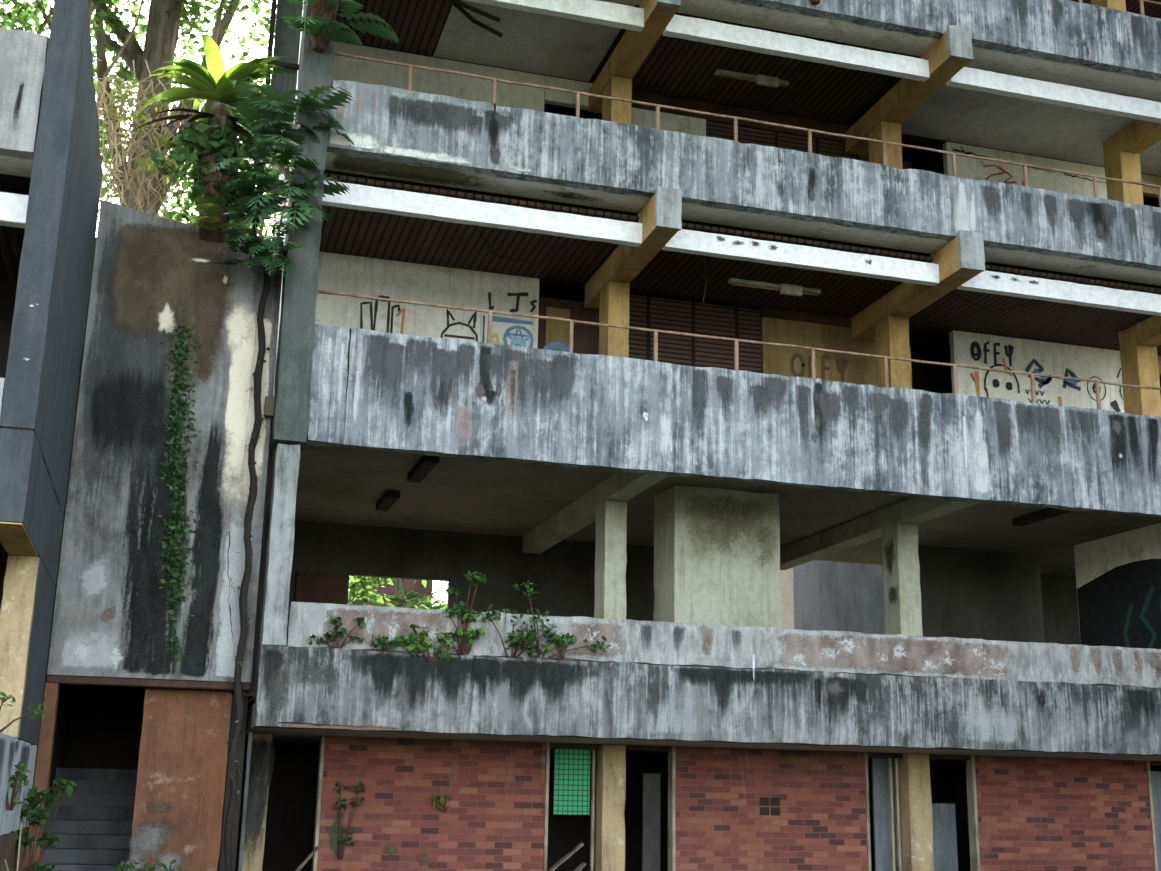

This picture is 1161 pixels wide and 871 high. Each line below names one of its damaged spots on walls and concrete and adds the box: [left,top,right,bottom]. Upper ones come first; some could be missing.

leakage [1012,0,1028,23]
leakage [1051,0,1062,27]
leakage [1116,13,1161,52]
leakage [389,95,514,134]
leakage [808,168,816,201]
leakage [83,229,227,677]
leakage [322,335,576,424]
leakage [660,411,672,456]
leakage [693,369,733,428]
leakage [750,377,933,445]
leakage [358,654,585,704]
leakage [649,627,867,733]